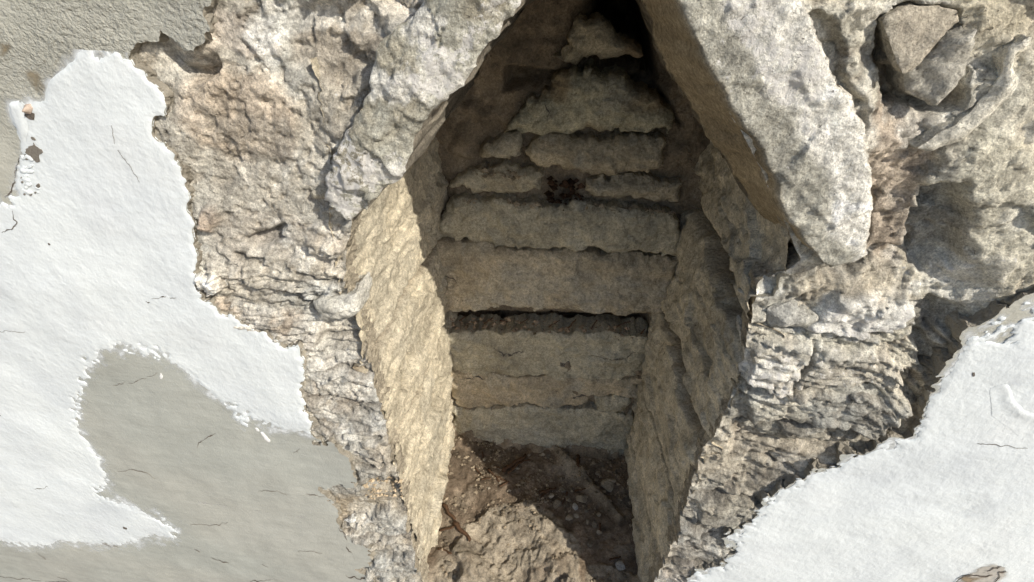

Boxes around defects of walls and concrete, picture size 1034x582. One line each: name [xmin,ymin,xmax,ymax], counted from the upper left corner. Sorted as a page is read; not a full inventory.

peeling [0,0,430,582]
spalling [647,0,1034,582]